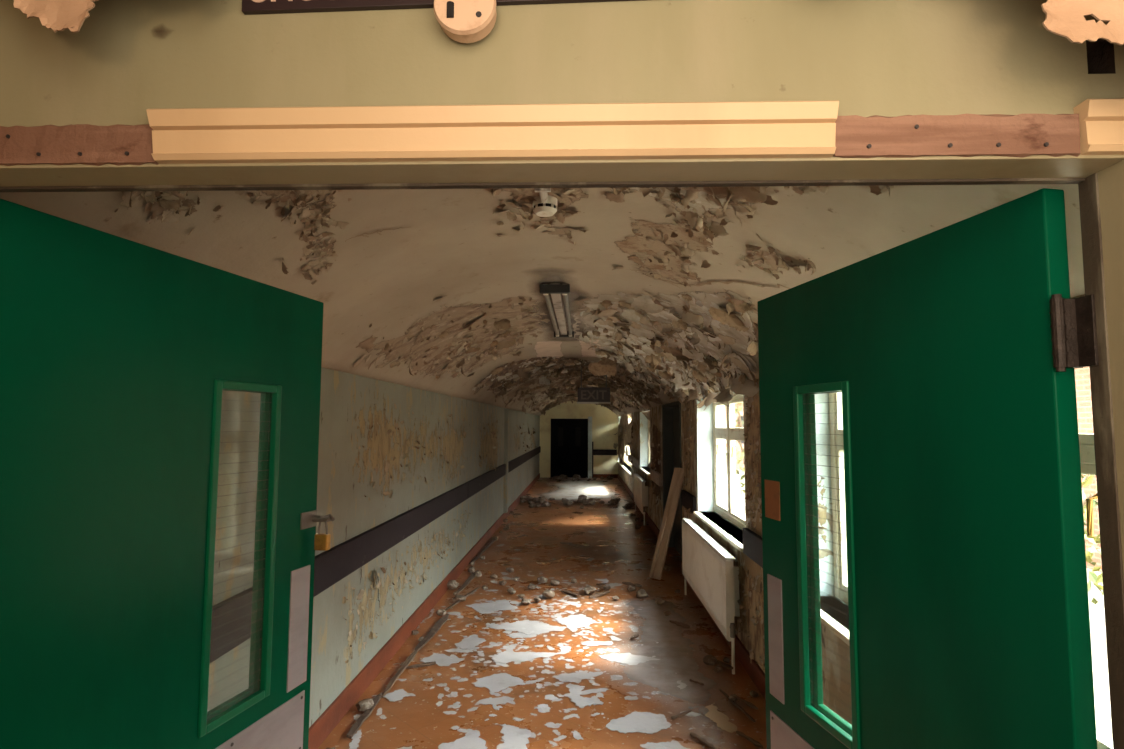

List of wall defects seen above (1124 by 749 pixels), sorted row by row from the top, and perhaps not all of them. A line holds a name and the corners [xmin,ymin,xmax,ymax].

peeling [13,0,98,33]
peeling [1041,0,1124,45]
peeling [115,191,224,235]
peeling [236,190,352,285]
peeling [353,186,829,537]
peeling [818,476,834,559]